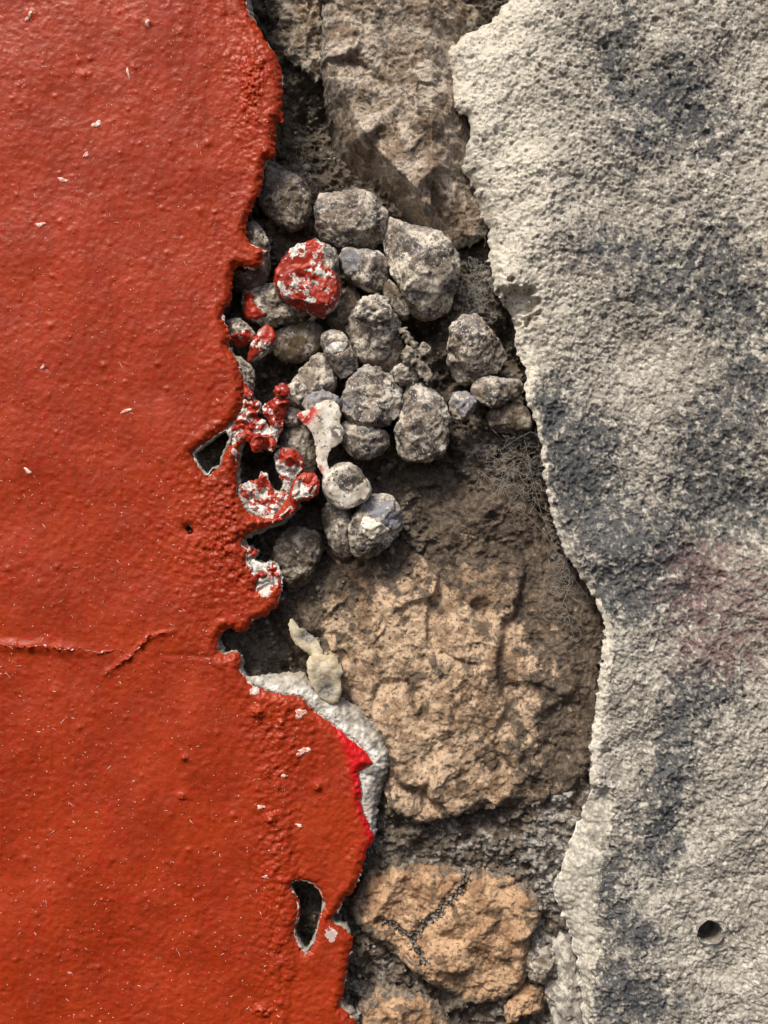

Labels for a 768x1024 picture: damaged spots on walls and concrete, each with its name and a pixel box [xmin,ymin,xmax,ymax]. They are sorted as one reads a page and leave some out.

spalling [466,0,508,33]
spalling [252,0,412,298]
spalling [196,230,561,678]
crack [0,630,211,670]
spalling [294,881,322,940]
crack [374,861,474,966]
spalling [340,771,590,1024]